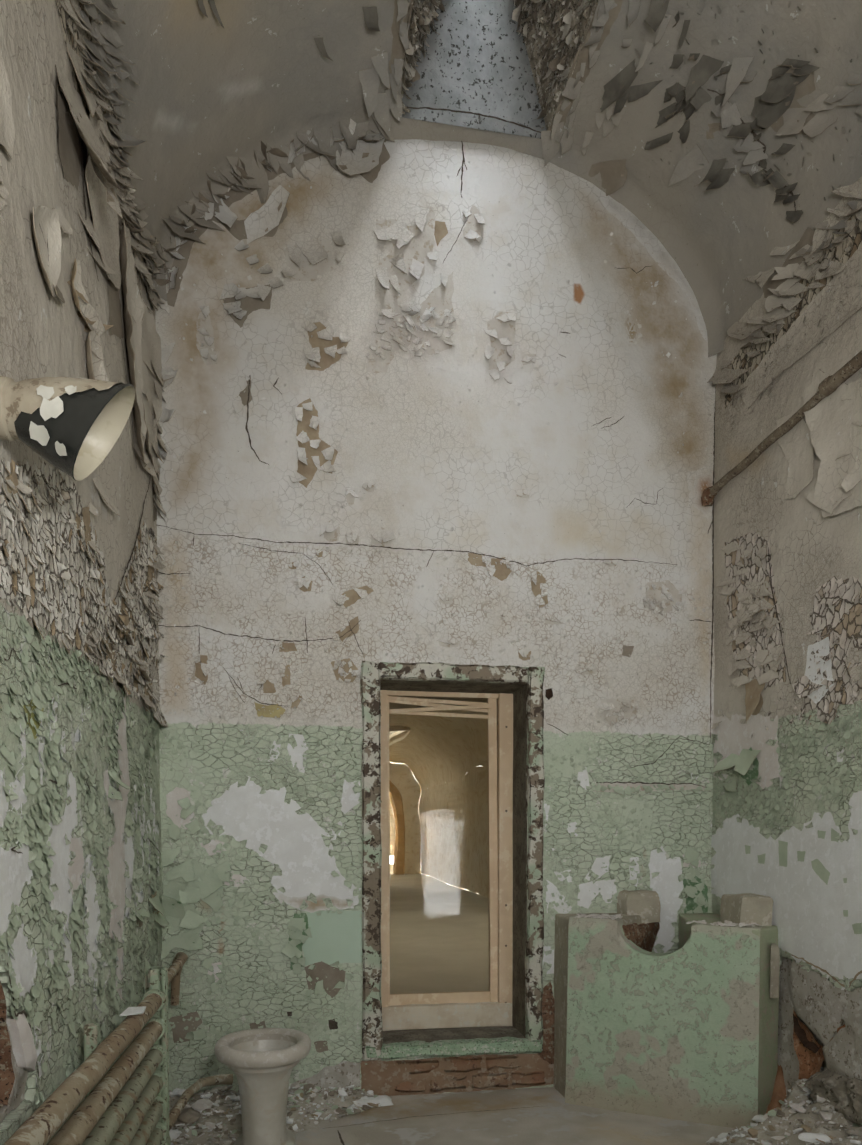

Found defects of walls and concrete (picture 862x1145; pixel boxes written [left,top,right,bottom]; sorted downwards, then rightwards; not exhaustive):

peeling [462,194,485,243]
peeling [471,285,553,384]
peeling [776,369,862,518]
peeling [0,0,456,1124]
peeling [543,791,862,1127]